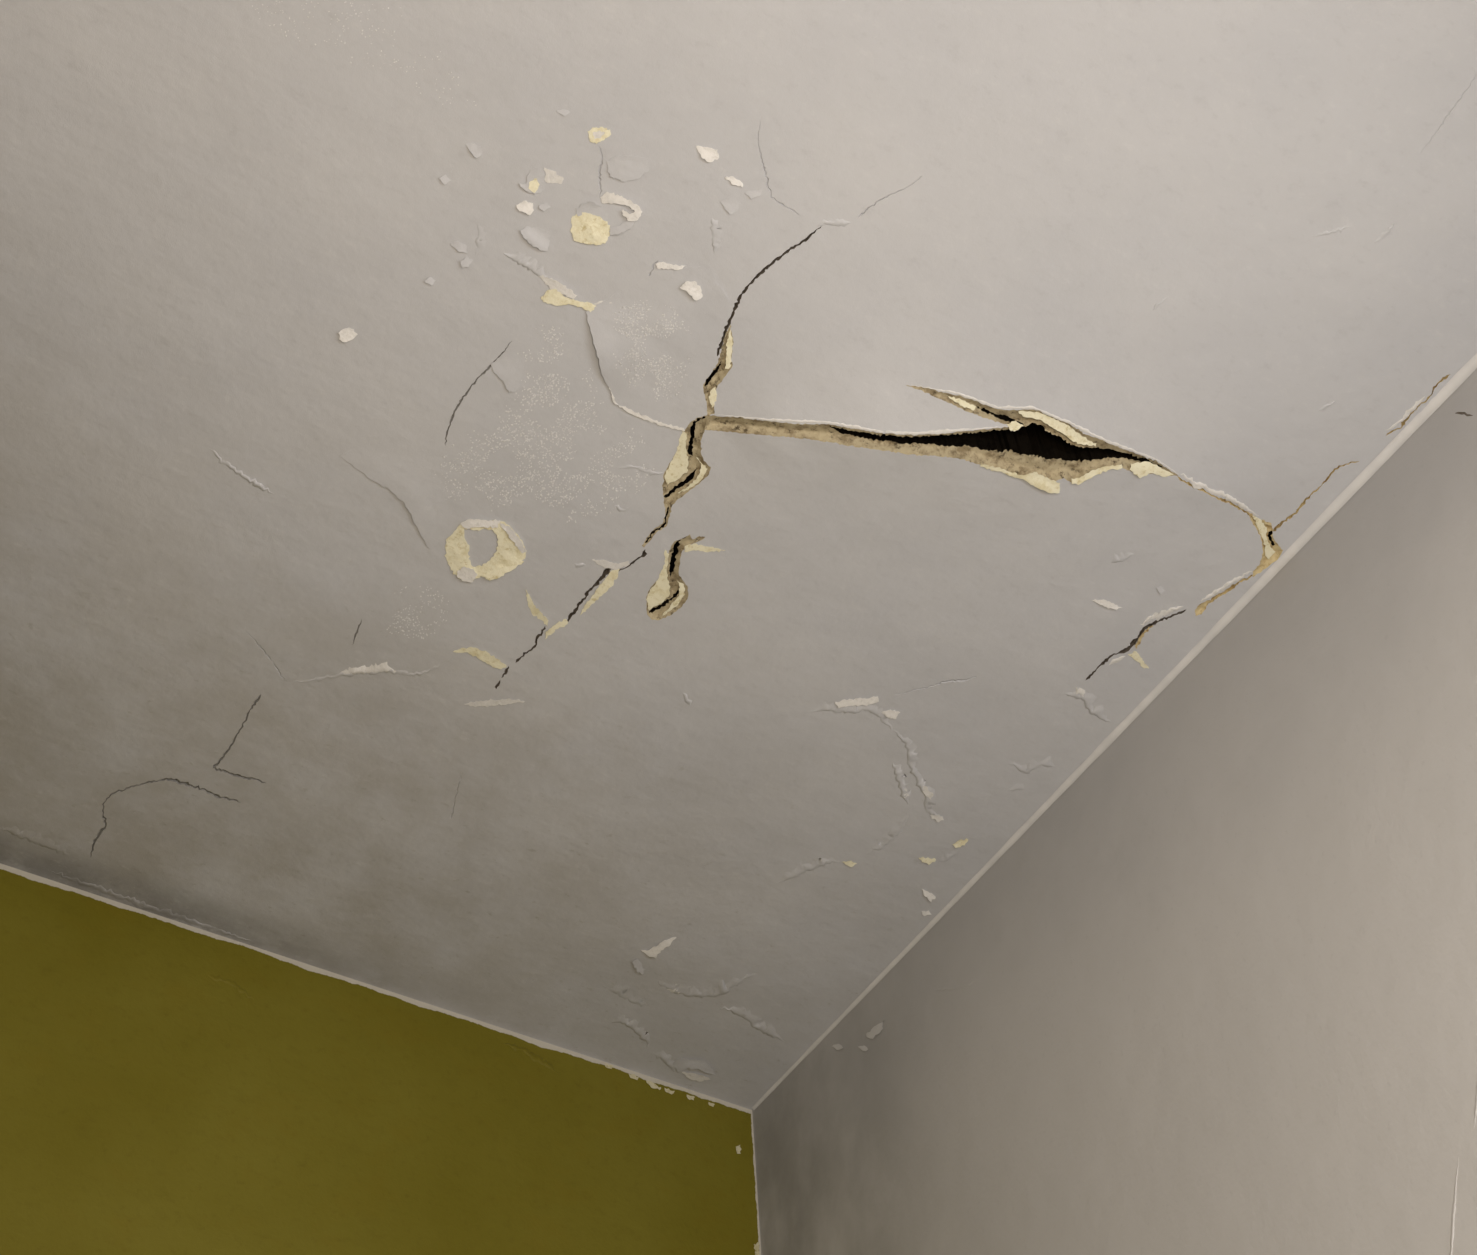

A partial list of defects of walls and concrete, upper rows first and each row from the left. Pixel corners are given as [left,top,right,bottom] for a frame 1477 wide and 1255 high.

peeling [696,146,719,162]
peeling [503,167,730,431]
crack [495,122,1359,689]
crack [1386,375,1473,444]
crack [90,632,284,857]
peeling [810,696,944,822]
peeling [922,889,936,916]
peeling [632,937,676,974]
peeling [629,1074,715,1107]